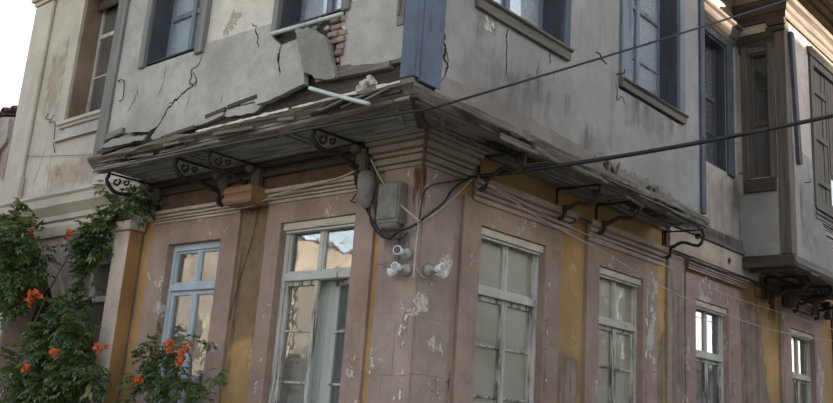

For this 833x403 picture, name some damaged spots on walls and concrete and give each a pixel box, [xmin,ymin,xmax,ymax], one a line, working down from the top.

crack [148,57,202,138]
spalling [161,16,401,139]
crack [442,33,450,76]
peeling [645,280,656,358]
damp [740,296,769,403]